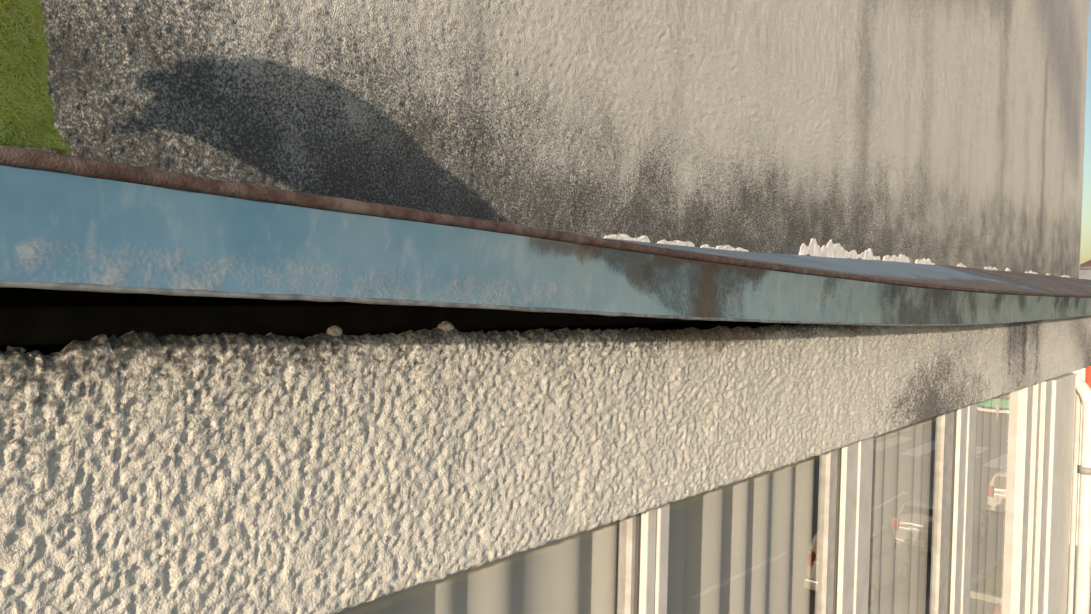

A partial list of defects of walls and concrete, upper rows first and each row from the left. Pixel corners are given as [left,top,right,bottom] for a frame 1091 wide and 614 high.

damp [40,0,1080,278]
damp [891,336,983,428]